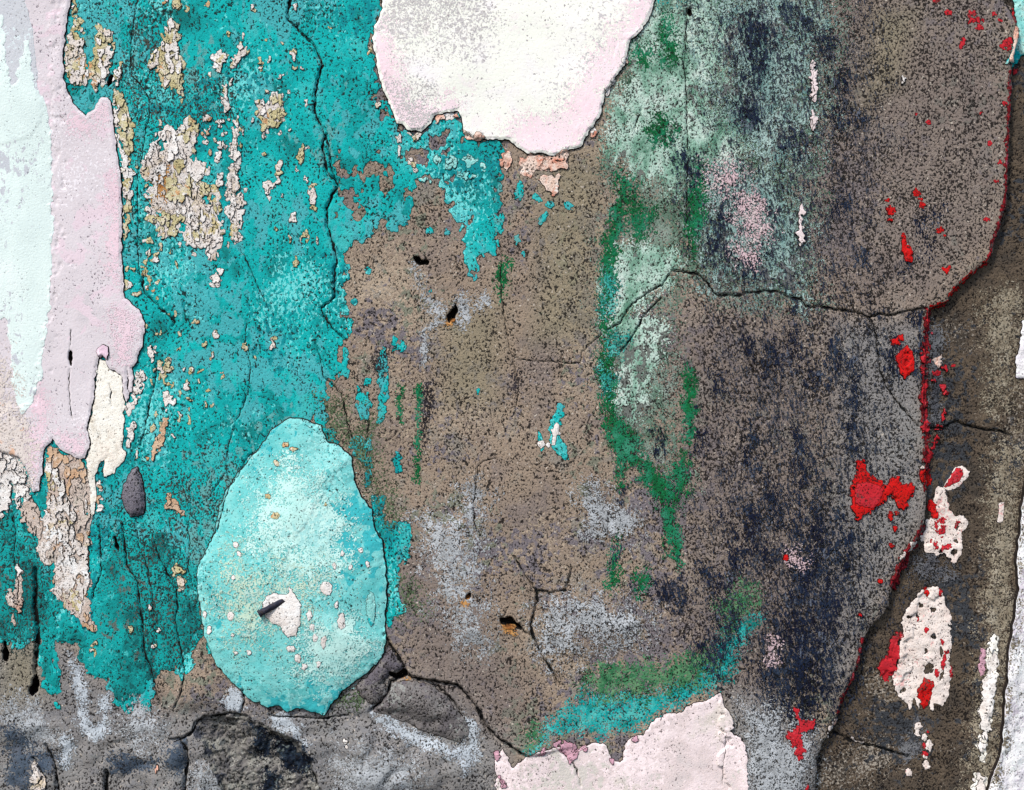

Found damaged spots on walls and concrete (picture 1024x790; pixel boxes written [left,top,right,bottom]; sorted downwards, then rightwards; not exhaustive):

crack [287,0,370,444]
peeling [0,0,695,714]
crack [500,251,1012,436]
peeling [785,0,1024,790]
crack [173,690,347,790]
crack [373,638,524,755]
crack [515,558,572,680]